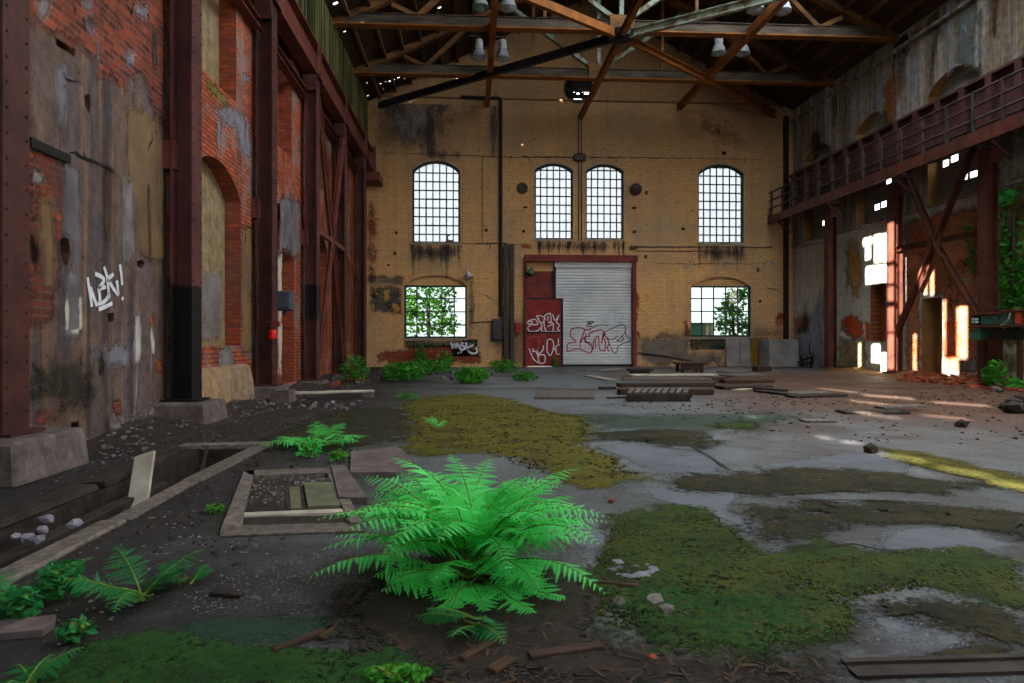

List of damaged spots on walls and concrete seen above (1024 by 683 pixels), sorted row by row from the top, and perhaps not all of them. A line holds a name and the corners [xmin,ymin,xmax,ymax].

flaking render [30,0,166,128]
peeling [217,104,253,158]
flaking render [30,150,82,338]
peeling [278,195,300,291]
leakage [411,245,459,261]
leakage [538,241,605,253]
leakage [699,246,744,259]
flaking render [837,313,870,368]